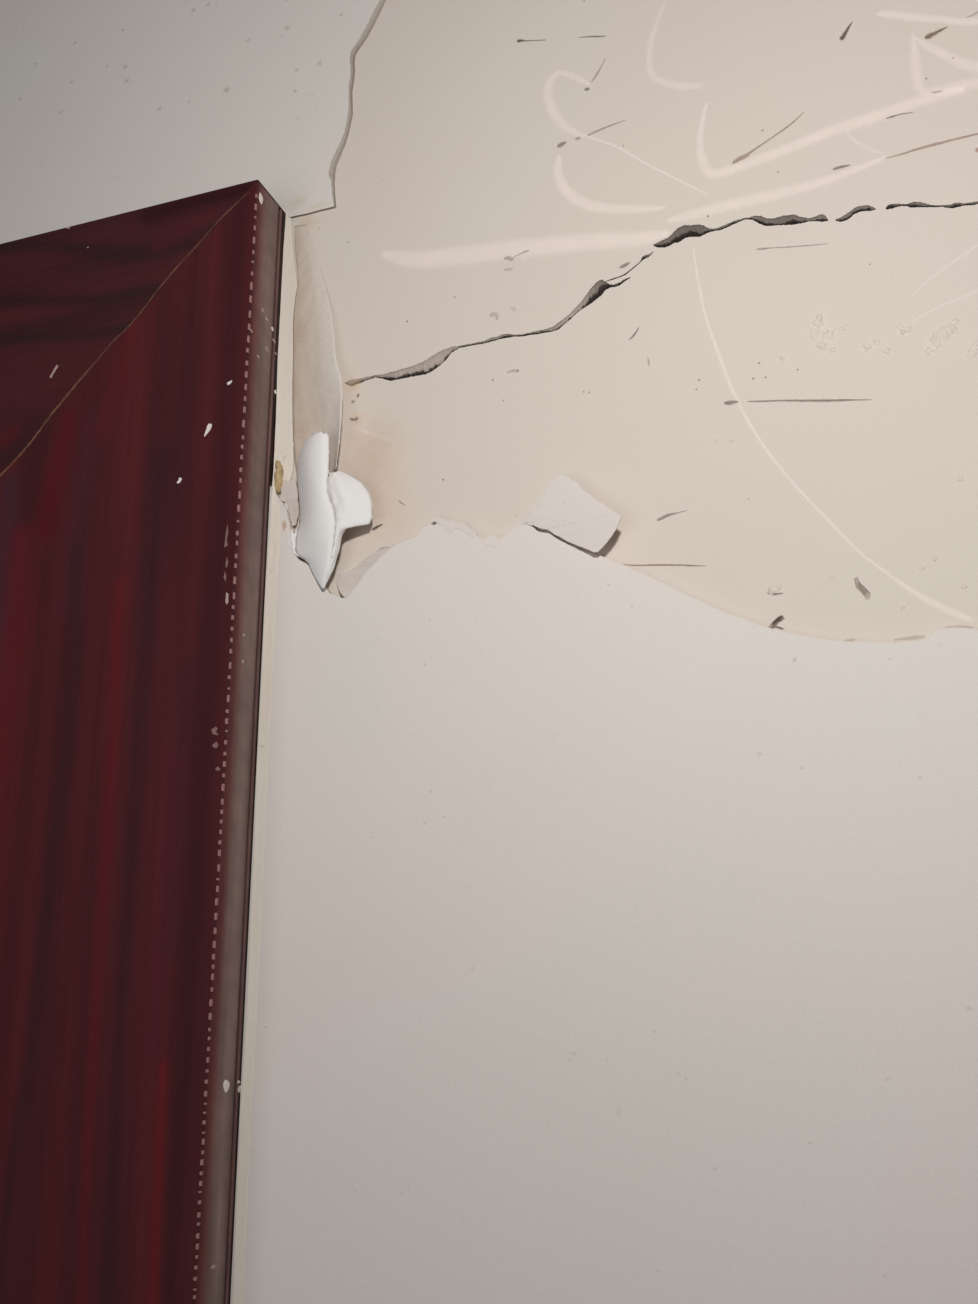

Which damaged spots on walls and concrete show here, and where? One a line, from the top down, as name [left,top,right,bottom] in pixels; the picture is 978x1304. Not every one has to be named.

peeling [278,0,978,643]
crack [345,201,978,386]